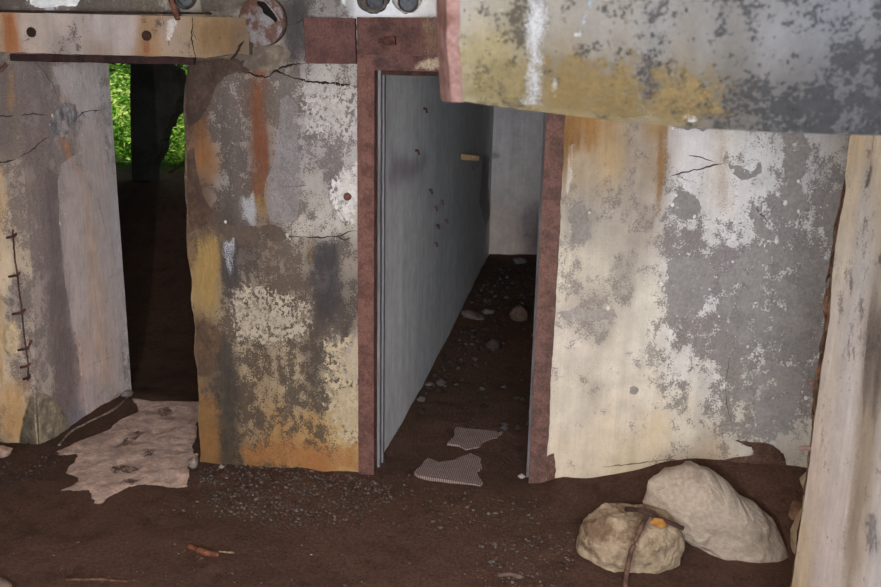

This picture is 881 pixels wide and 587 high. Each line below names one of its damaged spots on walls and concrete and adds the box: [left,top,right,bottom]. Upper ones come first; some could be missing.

peeling [26,0,79,8]
crack [231,17,352,86]
rust [248,53,270,226]
crack [672,155,724,181]
crack [254,230,354,241]
leakage [218,237,242,301]